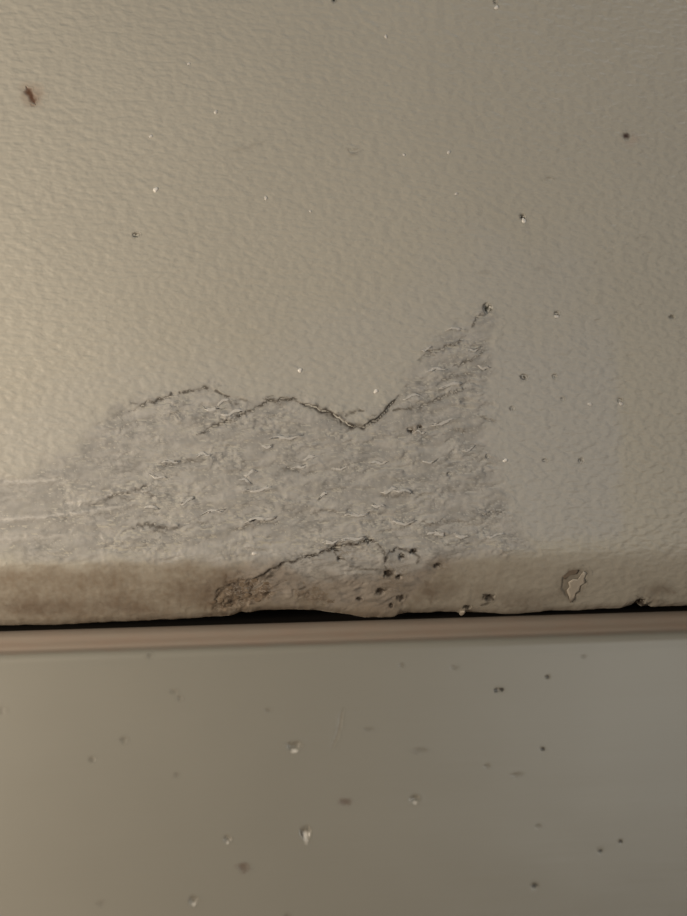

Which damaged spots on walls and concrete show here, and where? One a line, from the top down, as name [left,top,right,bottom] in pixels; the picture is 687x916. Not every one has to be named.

crack [128,383,405,436]
peeling [70,302,543,617]
crack [243,536,422,590]
peeling [556,564,592,603]